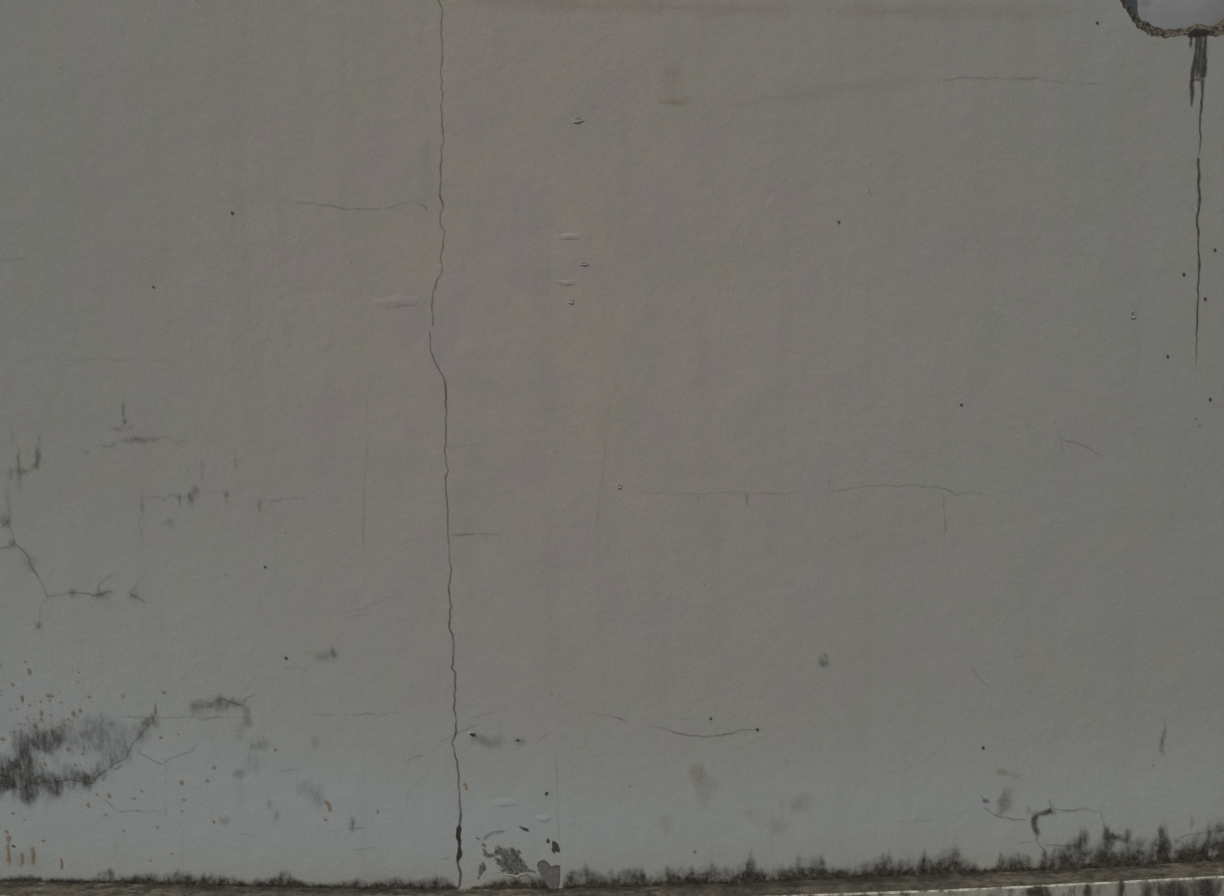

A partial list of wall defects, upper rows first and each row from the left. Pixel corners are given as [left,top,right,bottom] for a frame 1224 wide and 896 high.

spalling [1120,0,1224,39]
crack [448,562,462,889]
leakage [0,731,92,803]
leakage [0,871,456,889]
peeling [475,837,560,889]
leakage [471,828,1224,896]